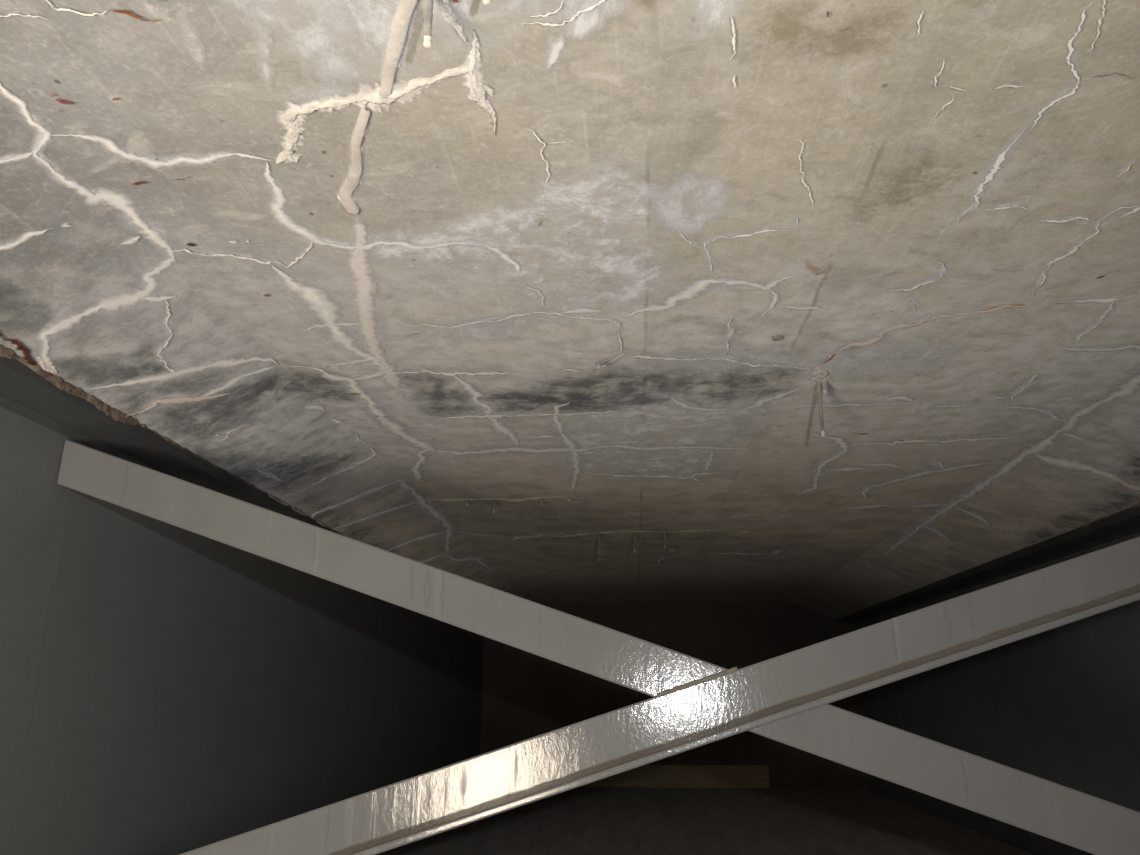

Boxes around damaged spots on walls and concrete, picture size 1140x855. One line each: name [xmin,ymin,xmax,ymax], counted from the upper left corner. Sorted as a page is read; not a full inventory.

damp [698,0,734,24]
damp [257,0,728,397]
crack [0,0,1140,570]
rust [0,334,67,385]
damp [60,359,161,383]
damp [501,342,953,480]